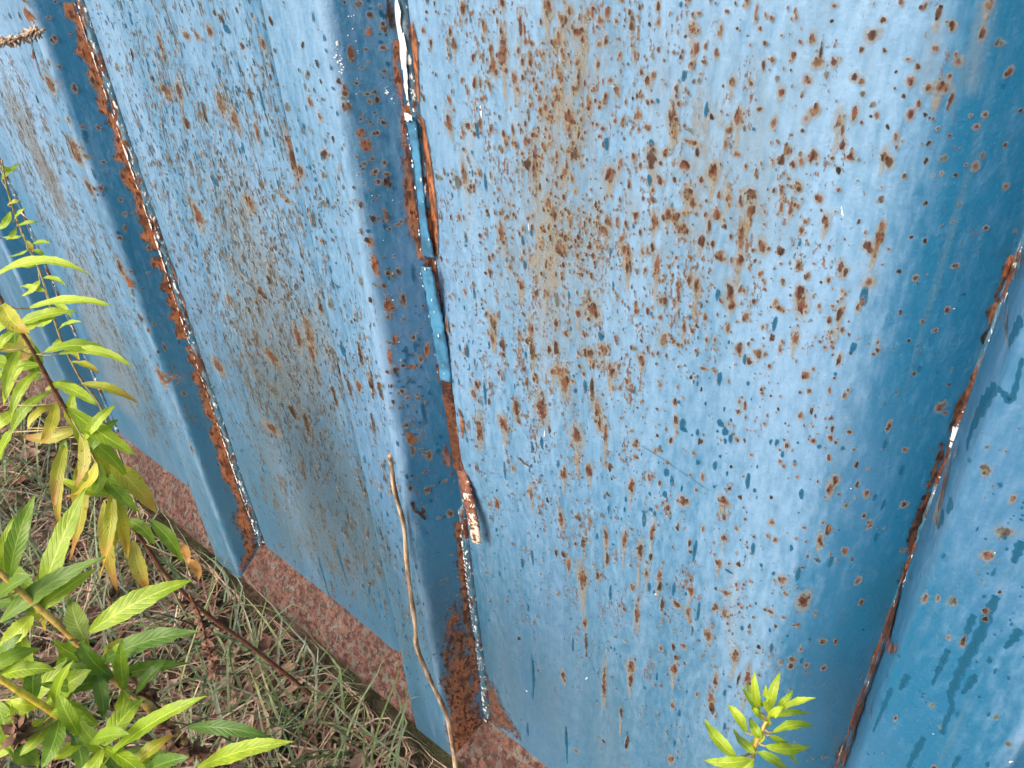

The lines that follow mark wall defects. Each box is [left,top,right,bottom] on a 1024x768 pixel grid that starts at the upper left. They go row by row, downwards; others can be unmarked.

corrosion [859,17,887,53]
corrosion [919,2,956,33]
corrosion [979,0,993,39]
corrosion [906,45,961,130]
corrosion [872,133,903,173]
corrosion [863,214,890,285]
corrosion [0,0,865,718]
peeling [395,0,487,722]
corrosion [936,373,973,431]
corrosion [432,511,521,765]
corrosion [807,442,957,768]